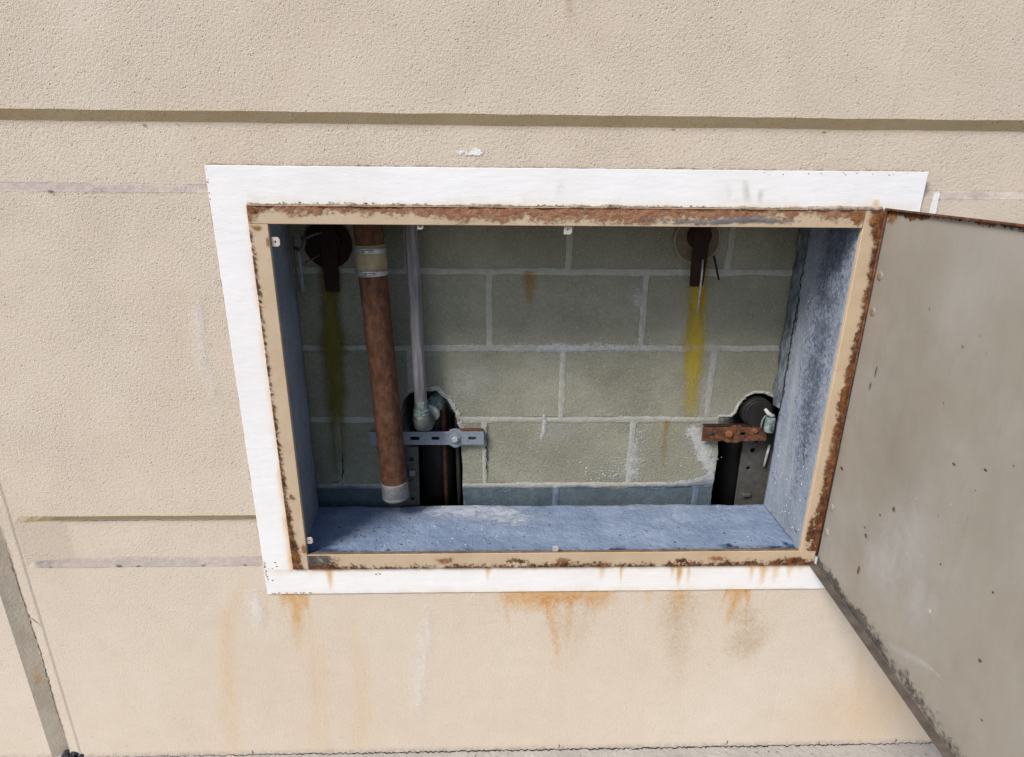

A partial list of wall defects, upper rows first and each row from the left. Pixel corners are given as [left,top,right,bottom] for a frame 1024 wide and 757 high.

spalling [407,386,463,429]
damp [451,277,705,391]
rust [246,205,1024,570]
spalling [718,391,773,418]